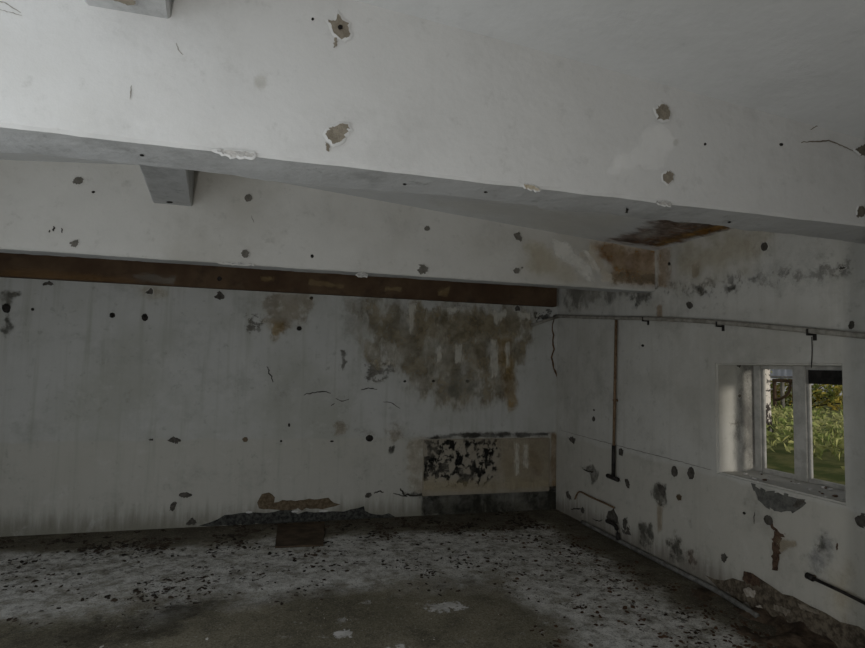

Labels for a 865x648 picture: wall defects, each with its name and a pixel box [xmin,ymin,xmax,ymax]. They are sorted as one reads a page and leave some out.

spalling [324,9,353,48]
crack [550,316,558,377]
peeling [423,439,498,486]
spalling [184,491,404,526]
spalling [751,483,812,571]
spalling [707,571,865,648]